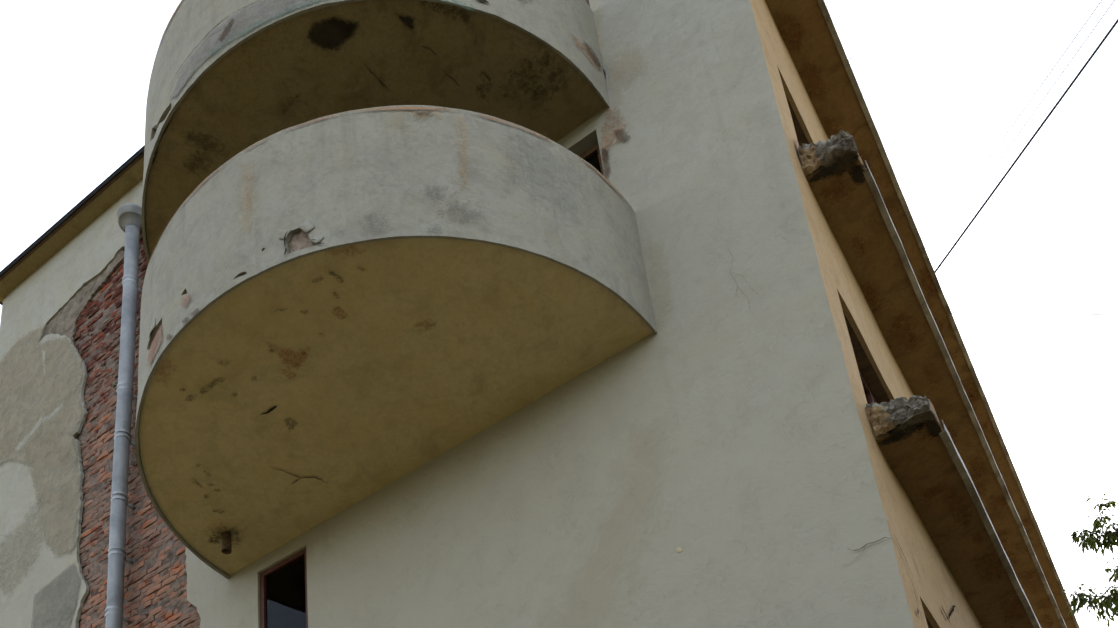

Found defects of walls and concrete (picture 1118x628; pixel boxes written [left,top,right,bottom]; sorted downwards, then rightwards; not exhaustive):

spalling [308,17,357,50]
spalling [795,129,865,184]
spalling [279,220,324,253]
peeling [42,248,125,628]
peeling [122,237,201,628]
spalling [865,395,942,445]
crack [269,466,321,484]